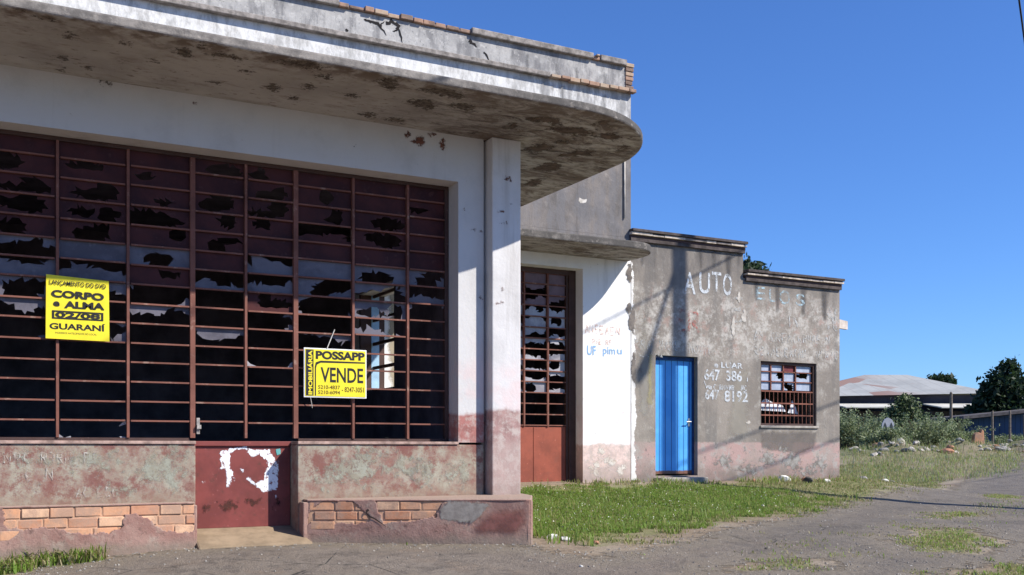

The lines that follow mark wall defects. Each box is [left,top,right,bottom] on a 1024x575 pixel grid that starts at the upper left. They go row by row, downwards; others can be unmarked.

spalling [338,2,471,35]
leakage [714,433,827,476]
peeling [310,446,488,529]